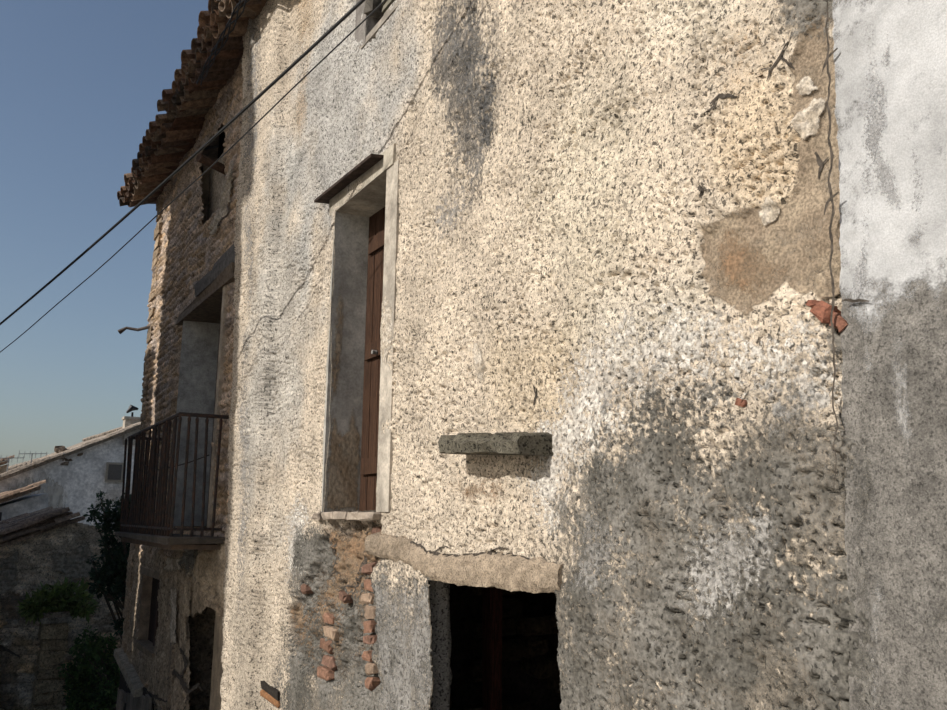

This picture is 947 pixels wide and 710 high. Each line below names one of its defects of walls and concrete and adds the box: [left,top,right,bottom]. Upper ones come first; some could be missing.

leakage [431,0,497,233]
spalling [701,14,848,351]
peeling [863,49,895,198]
spalling [290,521,382,691]
crack [396,536,535,560]